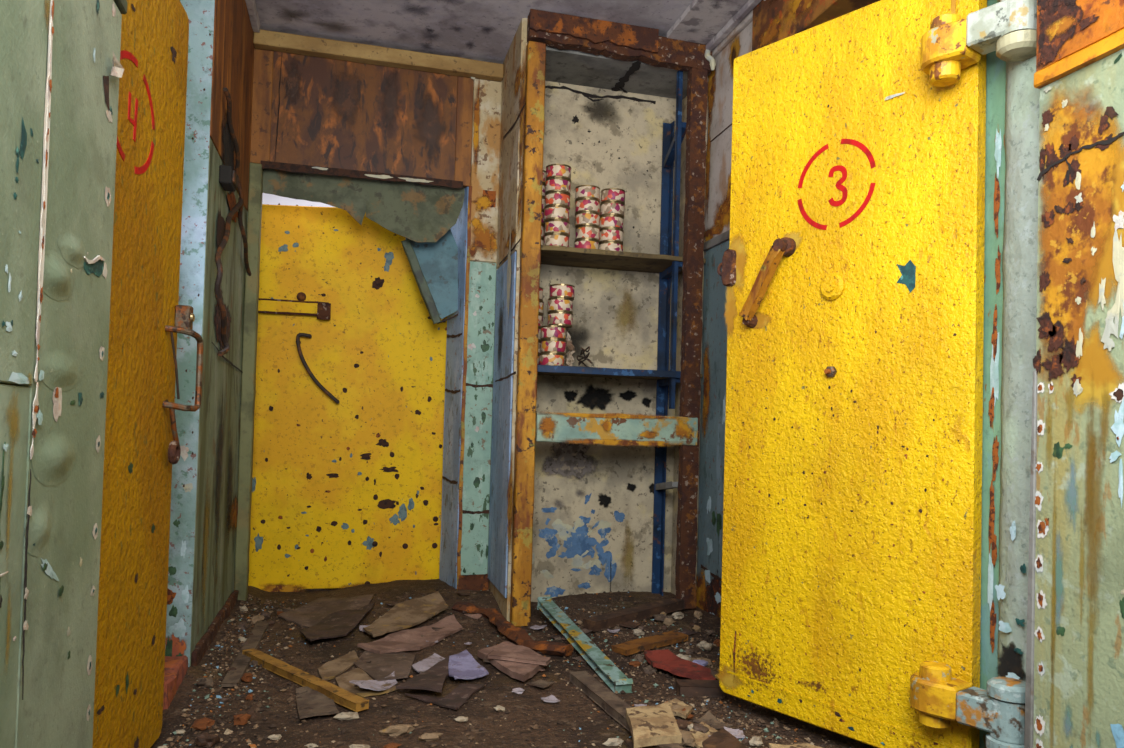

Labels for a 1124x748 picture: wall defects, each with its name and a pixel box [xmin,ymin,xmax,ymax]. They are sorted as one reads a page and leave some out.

corrosion [729,36,740,77]
corrosion [704,67,746,336]
crack [1037,132,1124,185]
peeling [70,252,107,279]
spalling [372,248,394,290]
peeling [1098,211,1124,351]
corrosion [539,347,710,446]
corrosion [1033,0,1124,709]
spalling [542,442,598,479]
peeling [532,493,625,597]
corrosion [1034,491,1056,748]